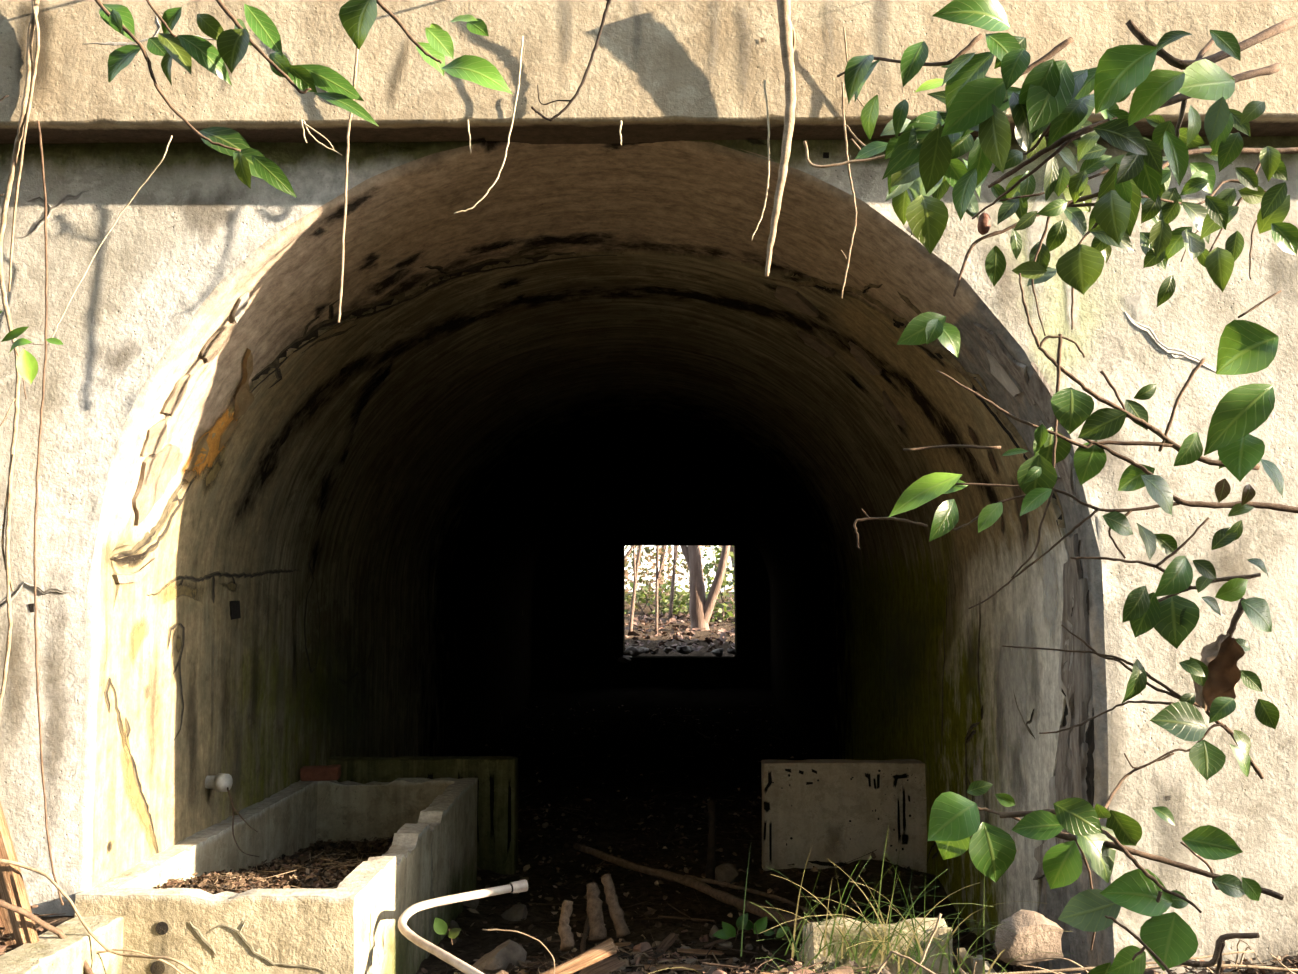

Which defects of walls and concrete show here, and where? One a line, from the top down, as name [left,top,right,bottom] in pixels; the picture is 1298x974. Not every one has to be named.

crack [16,190,89,238]
peeling [201,292,249,363]
crack [250,247,617,393]
peeling [132,374,190,526]
corrosion [184,348,254,490]
crack [111,476,196,562]
crack [147,569,301,603]
crack [104,677,159,854]
crack [168,623,185,740]
leakage [997,631,1026,758]
crack [1013,661,1095,807]
crack [189,920,328,974]